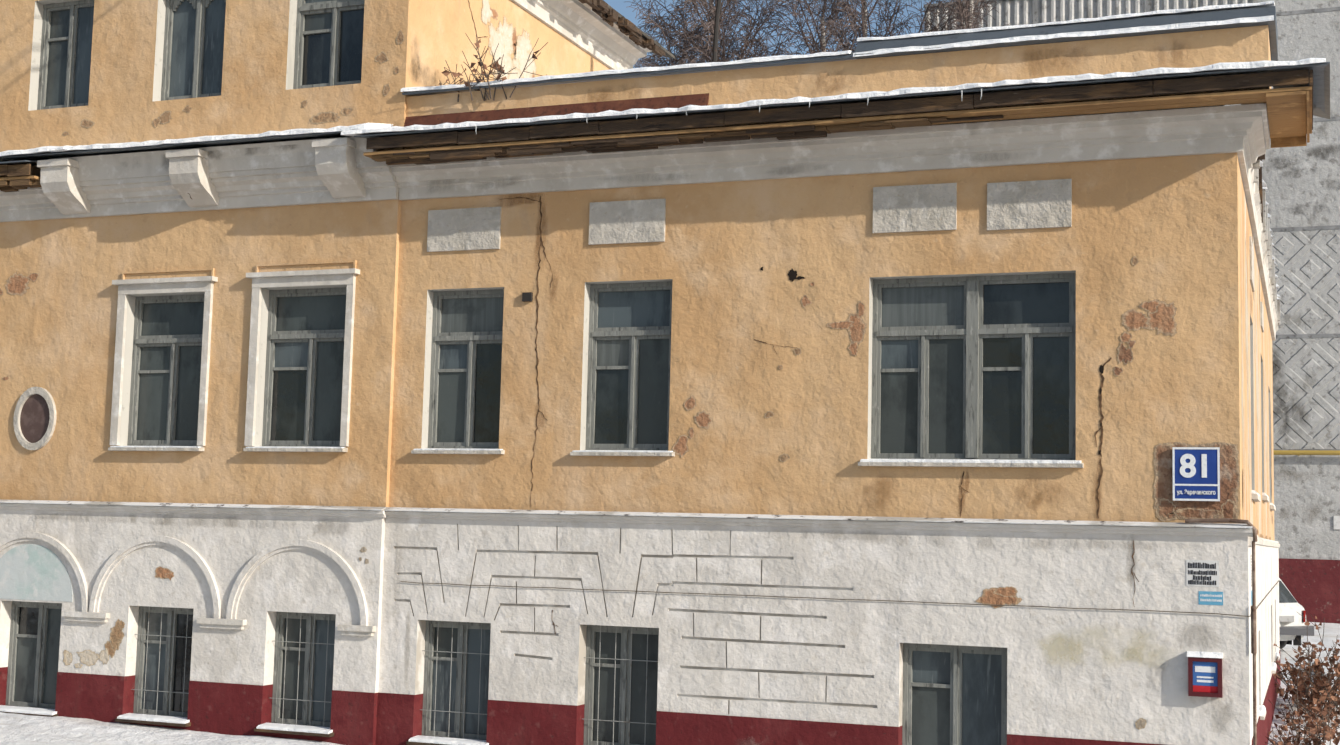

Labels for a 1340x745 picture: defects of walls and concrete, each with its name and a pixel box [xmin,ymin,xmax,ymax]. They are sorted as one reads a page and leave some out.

peeling [481,0,537,80]
flaking render [0,272,39,296]
flaking render [787,269,815,308]
crack [499,196,553,504]
flaking render [827,301,867,356]
flaking render [1099,299,1178,394]
flaking render [672,395,712,458]
crack [1095,358,1111,518]
peeling [155,566,174,581]
flaking render [976,586,1022,608]
peeling [63,619,125,668]